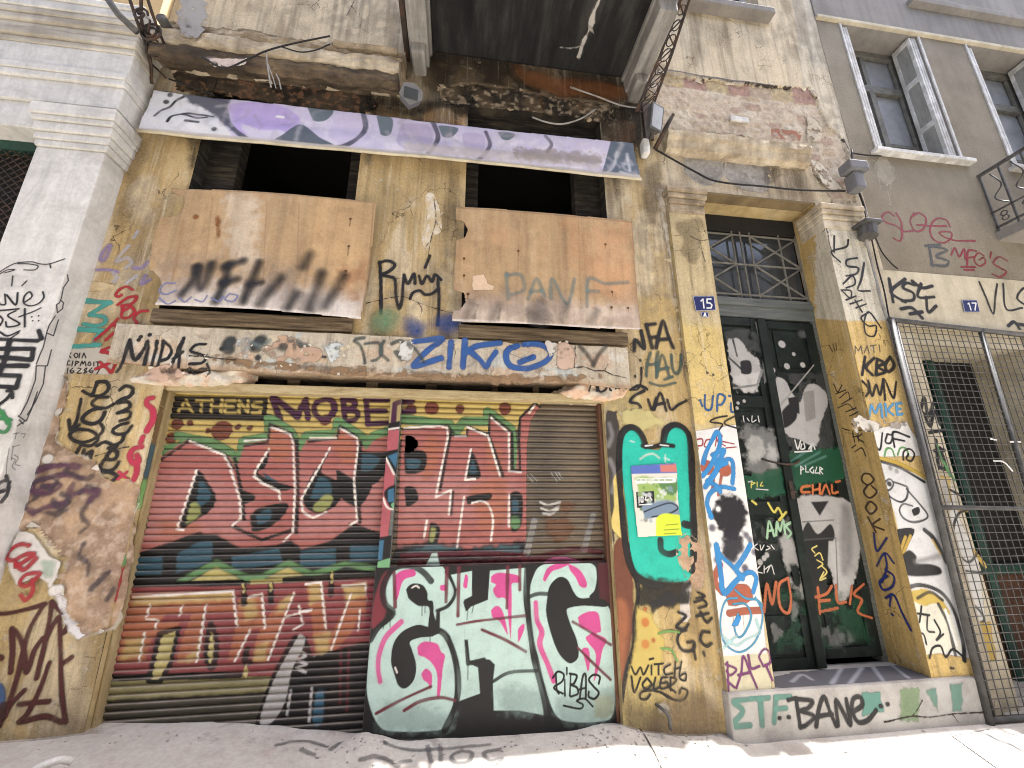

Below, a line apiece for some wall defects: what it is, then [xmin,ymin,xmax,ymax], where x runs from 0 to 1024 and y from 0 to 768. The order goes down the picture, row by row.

spalling [437,82,614,124]
spalling [651,65,859,205]
peeling [130,335,628,409]
peeling [853,415,907,433]
spalling [15,376,141,639]